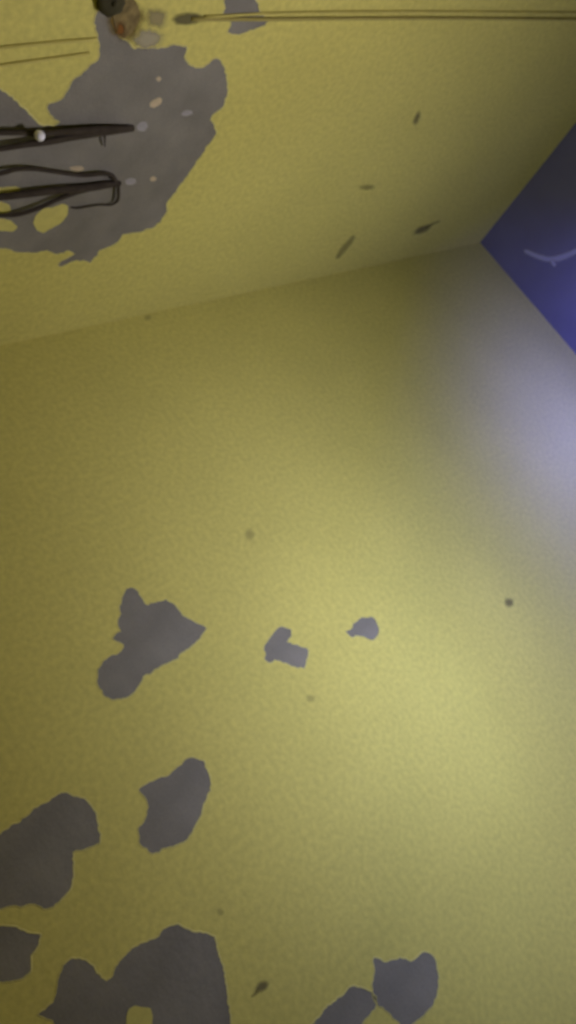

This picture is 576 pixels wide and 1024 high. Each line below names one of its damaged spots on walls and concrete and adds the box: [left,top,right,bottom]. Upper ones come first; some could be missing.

peeling [222,0,269,36]
peeling [0,9,229,267]
peeling [96,587,207,701]
peeling [263,625,309,669]
peeling [345,616,380,641]
peeling [0,791,102,911]
peeling [136,756,212,855]
peeling [0,924,42,984]
peeling [36,923,232,1024]
peeling [311,950,440,1024]